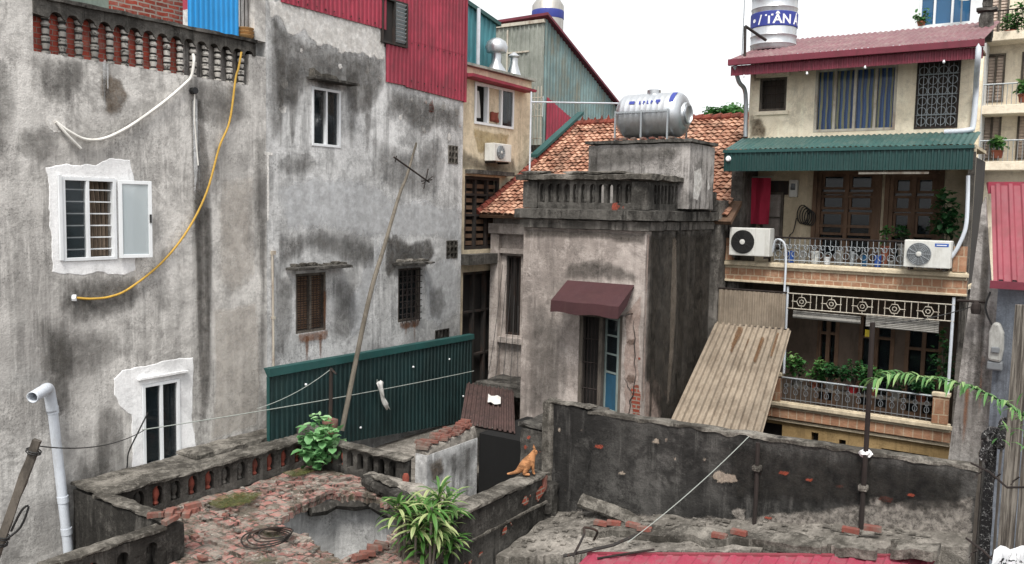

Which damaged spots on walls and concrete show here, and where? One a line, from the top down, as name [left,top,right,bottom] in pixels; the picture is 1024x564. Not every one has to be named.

leakage [280,34,381,110]
leakage [392,96,458,128]
leakage [195,103,209,411]
crack [625,321,636,414]
peeling [624,234,667,418]
rust [731,327,779,362]
leakage [733,447,960,510]